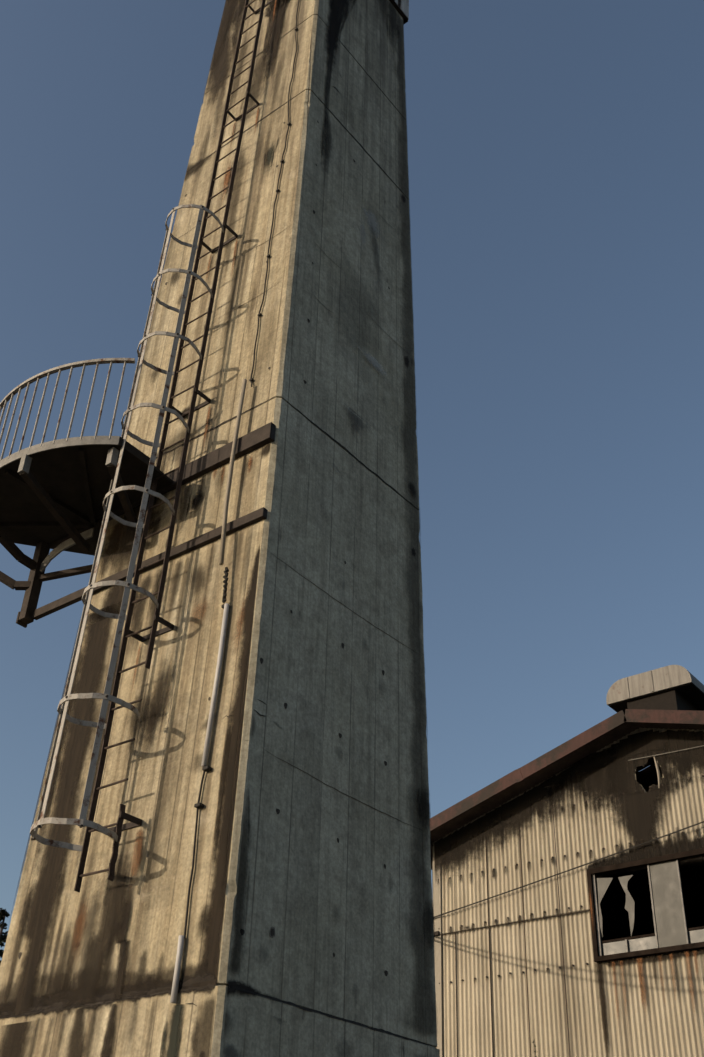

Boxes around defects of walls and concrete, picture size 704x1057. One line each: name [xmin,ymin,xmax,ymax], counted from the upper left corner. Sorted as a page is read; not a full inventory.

water stain [205,0,246,103]
water stain [248,0,289,109]
water stain [322,0,356,165]
water stain [184,158,208,180]
water stain [264,139,279,168]
water stain [180,478,203,523]
water stain [0,492,270,1057]
water stain [418,791,430,824]
water stain [434,729,704,875]